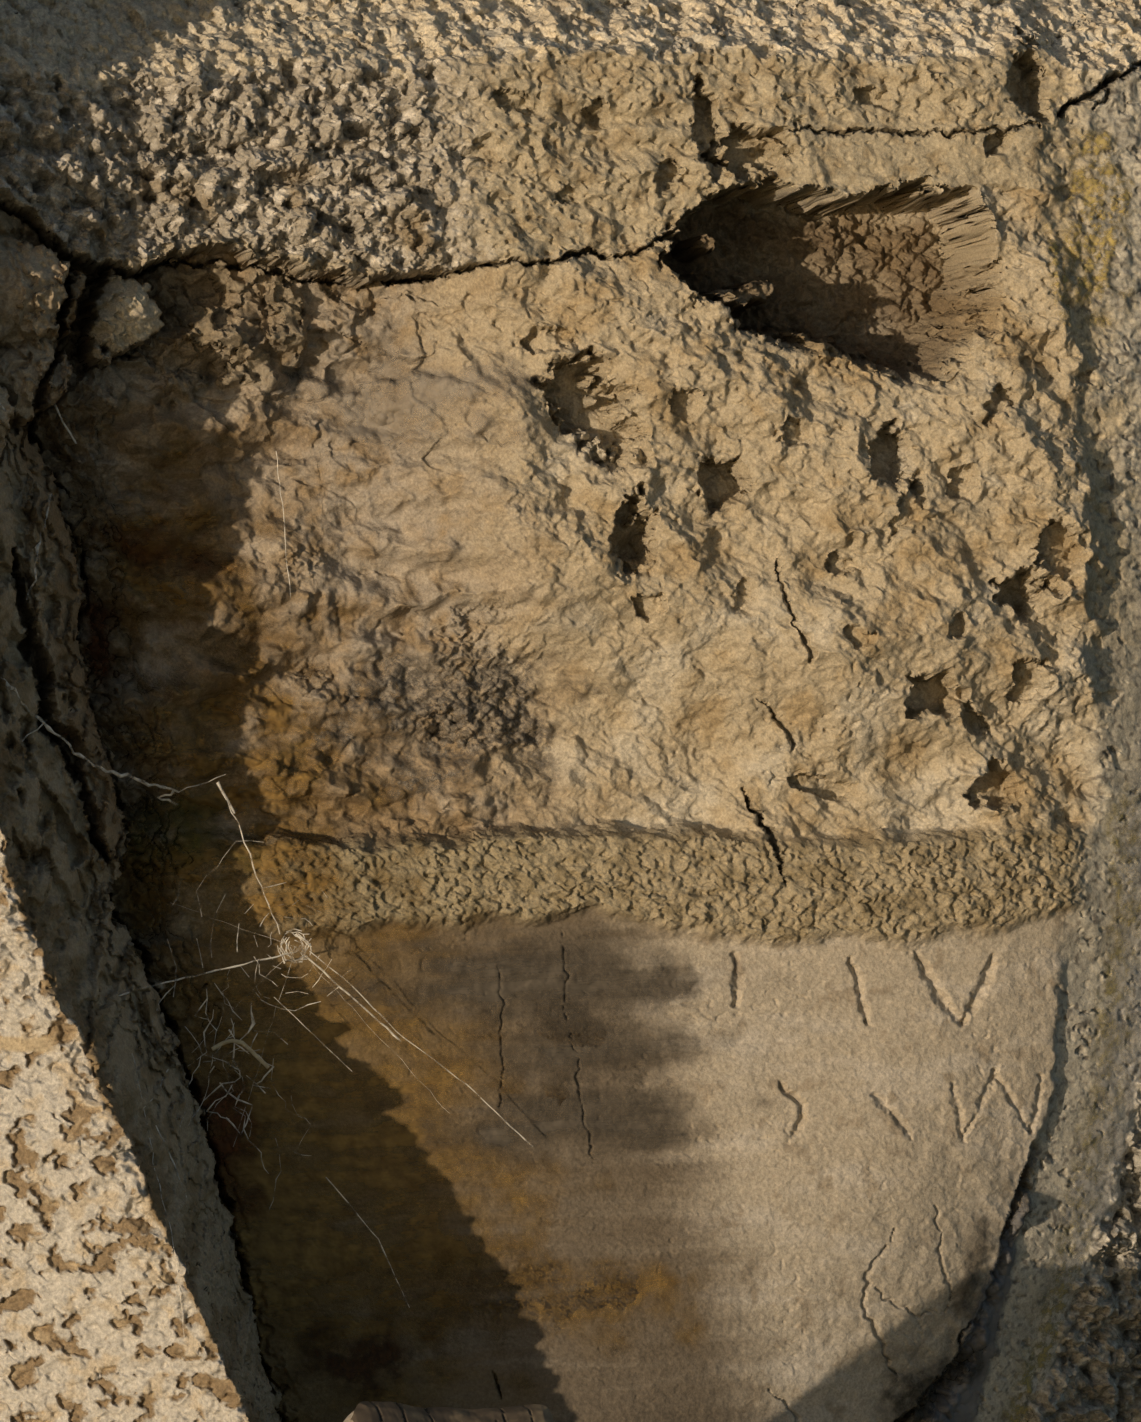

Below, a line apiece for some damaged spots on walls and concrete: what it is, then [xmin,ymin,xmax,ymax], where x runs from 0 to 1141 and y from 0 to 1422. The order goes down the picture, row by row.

crack [783,60,1141,139]
leakage [87,483,555,949]
crack [0,206,664,1422]
spalling [22,165,1100,862]
crack [742,787,788,883]
crack [757,698,797,751]
crack [775,558,818,664]
leakage [159,927,697,1407]
crack [768,1389,803,1422]
crack [860,1205,971,1422]